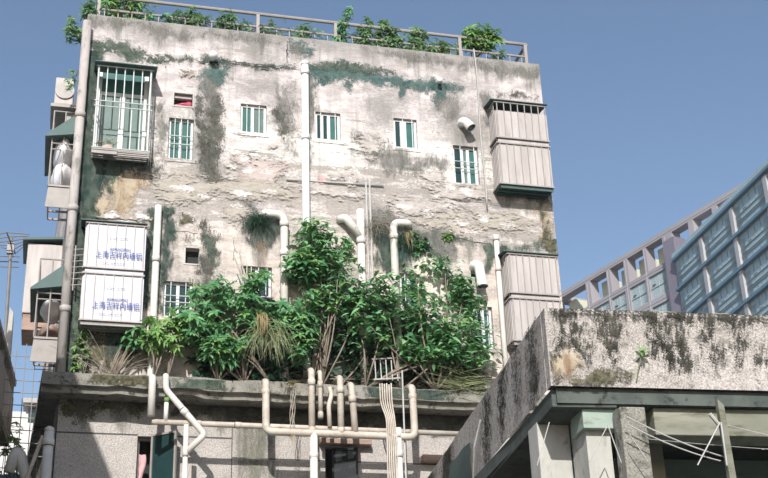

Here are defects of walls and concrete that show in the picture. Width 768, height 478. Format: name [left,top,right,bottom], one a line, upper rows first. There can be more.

damp [134,103,168,182]
damp [193,78,228,183]
damp [268,87,298,156]
damp [288,38,396,131]
damp [374,50,540,125]
damp [79,149,124,220]
spalling [95,210,153,223]
damp [65,298,159,387]
damp [549,308,768,385]
damp [59,399,160,425]
damp [170,404,469,478]
damp [231,307,540,465]